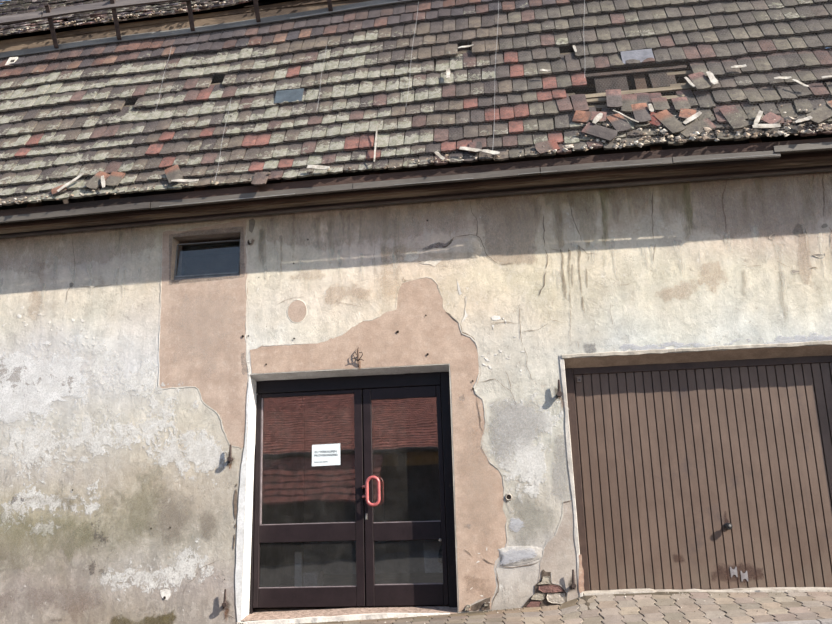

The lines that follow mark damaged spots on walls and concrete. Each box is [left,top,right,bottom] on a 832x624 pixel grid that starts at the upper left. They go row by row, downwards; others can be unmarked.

crack [457,202,510,264]
crack [539,215,555,295]
crack [499,310,579,376]
peeling [0,219,570,612]
crack [476,375,516,469]
peeling [522,500,584,608]